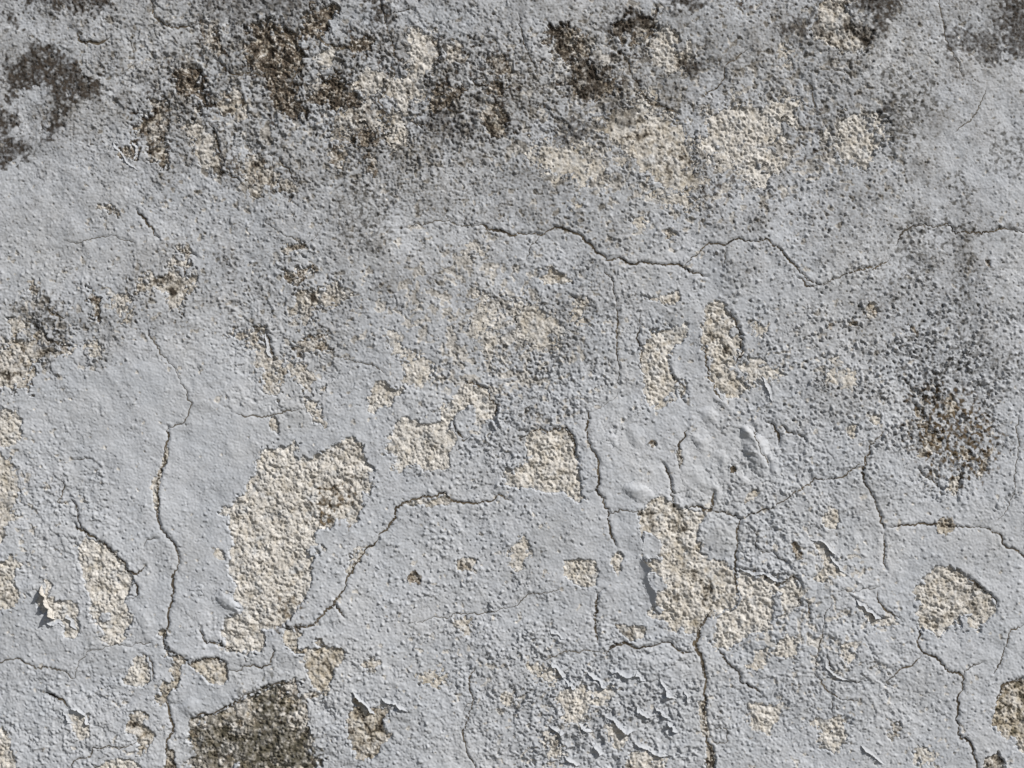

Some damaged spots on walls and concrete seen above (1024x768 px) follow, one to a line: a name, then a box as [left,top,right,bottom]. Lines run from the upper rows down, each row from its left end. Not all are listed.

mould [0,38,105,170]
mould [419,0,706,147]
mould [844,0,907,52]
mould [942,0,1024,65]
crack [401,220,1024,545]
peeling [37,536,134,646]
peeling [93,416,375,768]
crack [0,331,509,768]
peeling [525,661,669,768]
crack [544,591,760,767]
peeling [615,496,847,671]
crack [665,418,1024,768]